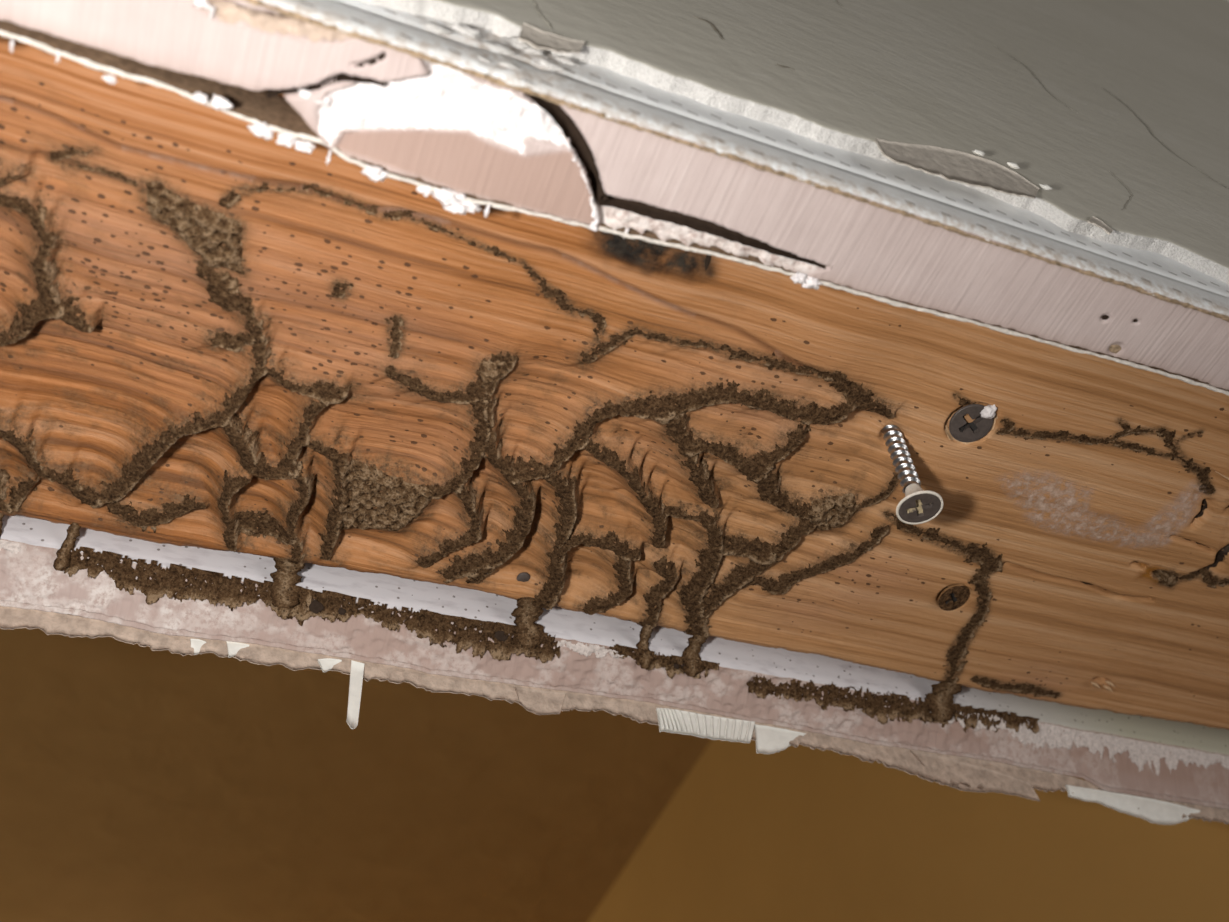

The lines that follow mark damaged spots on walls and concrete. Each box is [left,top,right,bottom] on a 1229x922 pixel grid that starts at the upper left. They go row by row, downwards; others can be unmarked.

flaking render [423,22,580,71]
peeling [298,89,334,107]
crack [518,78,826,271]
crack [1178,499,1208,547]
peeling [910,750,1040,802]
peeling [1065,785,1201,825]